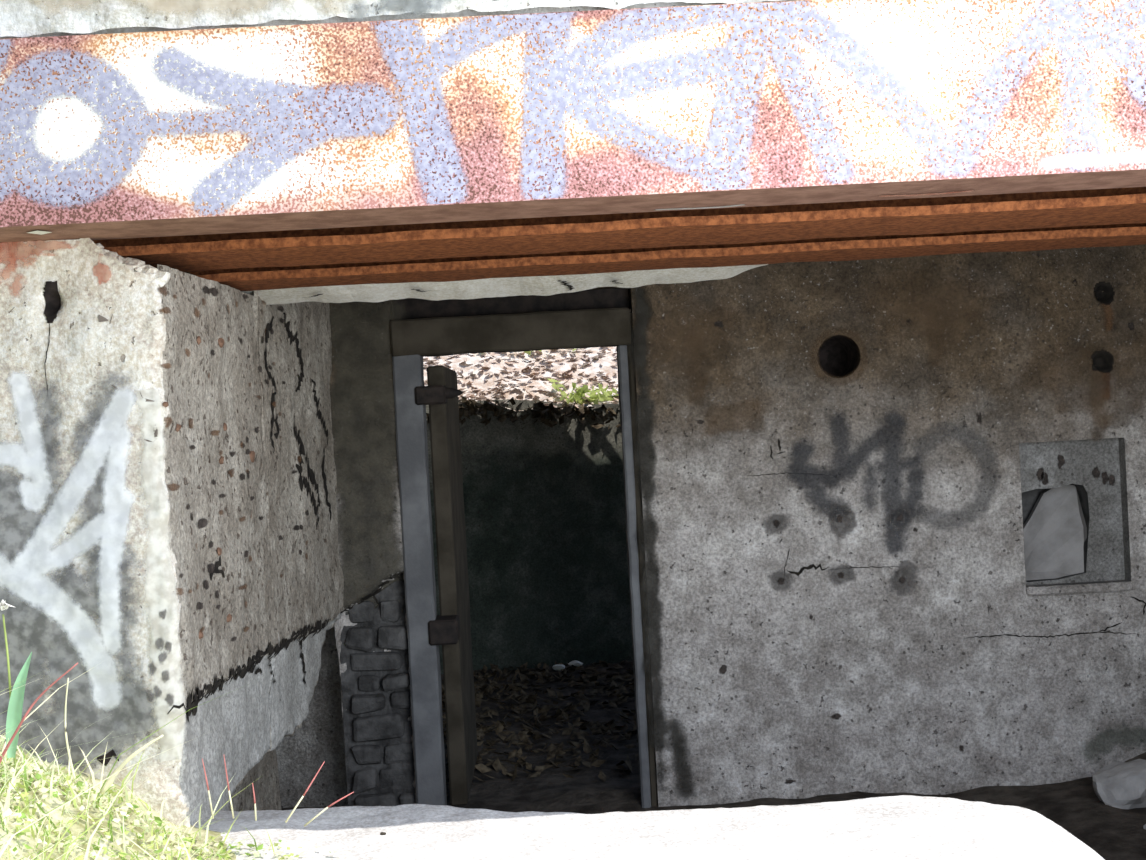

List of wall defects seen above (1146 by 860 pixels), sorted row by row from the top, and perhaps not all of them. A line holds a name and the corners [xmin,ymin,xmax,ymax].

corrosion [0,240,71,295]
corrosion [93,263,111,284]
crack [168,574,393,722]